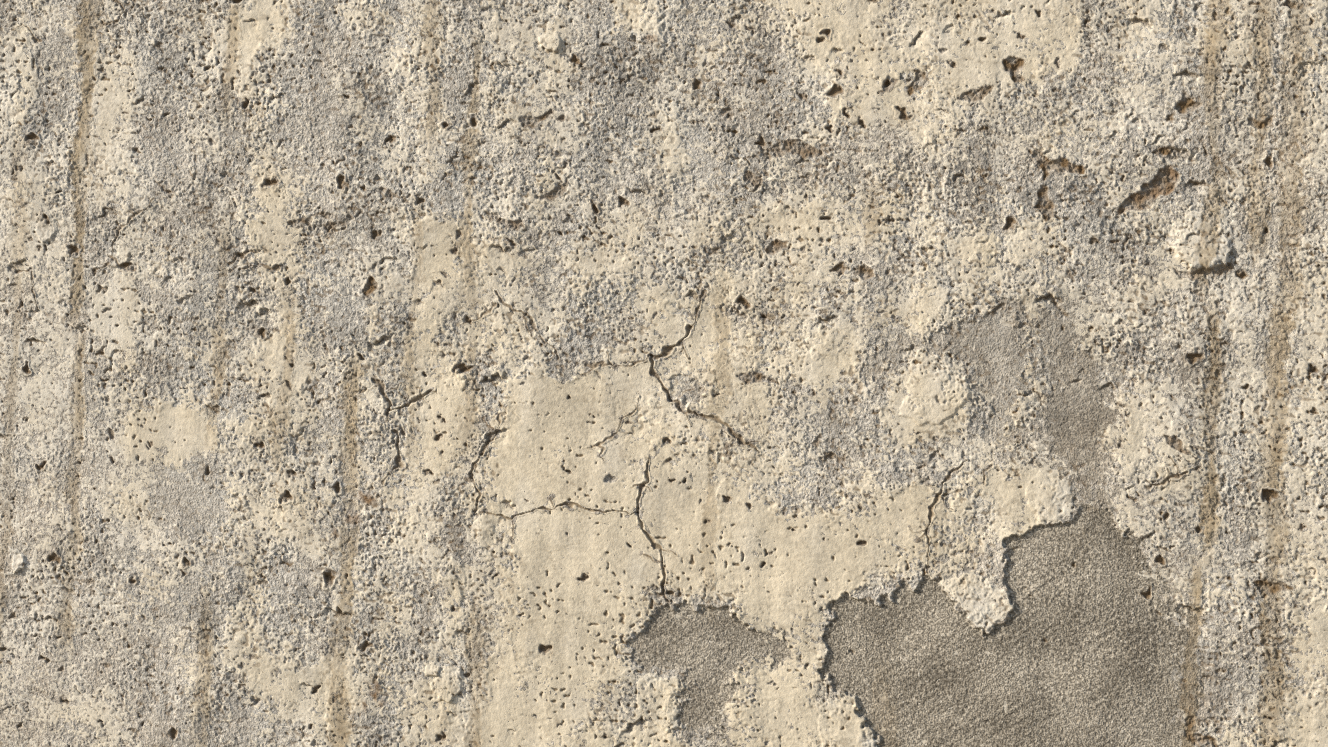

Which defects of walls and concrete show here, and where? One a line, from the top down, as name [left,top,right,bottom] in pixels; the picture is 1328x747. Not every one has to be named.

crack [462,287,764,463]
peeling [665,368,710,409]
spalling [732,291,757,314]
spalling [733,368,782,387]
leakage [1177,0,1323,747]
crack [466,412,679,604]
spalling [815,288,1222,747]
spalling [624,599,794,747]